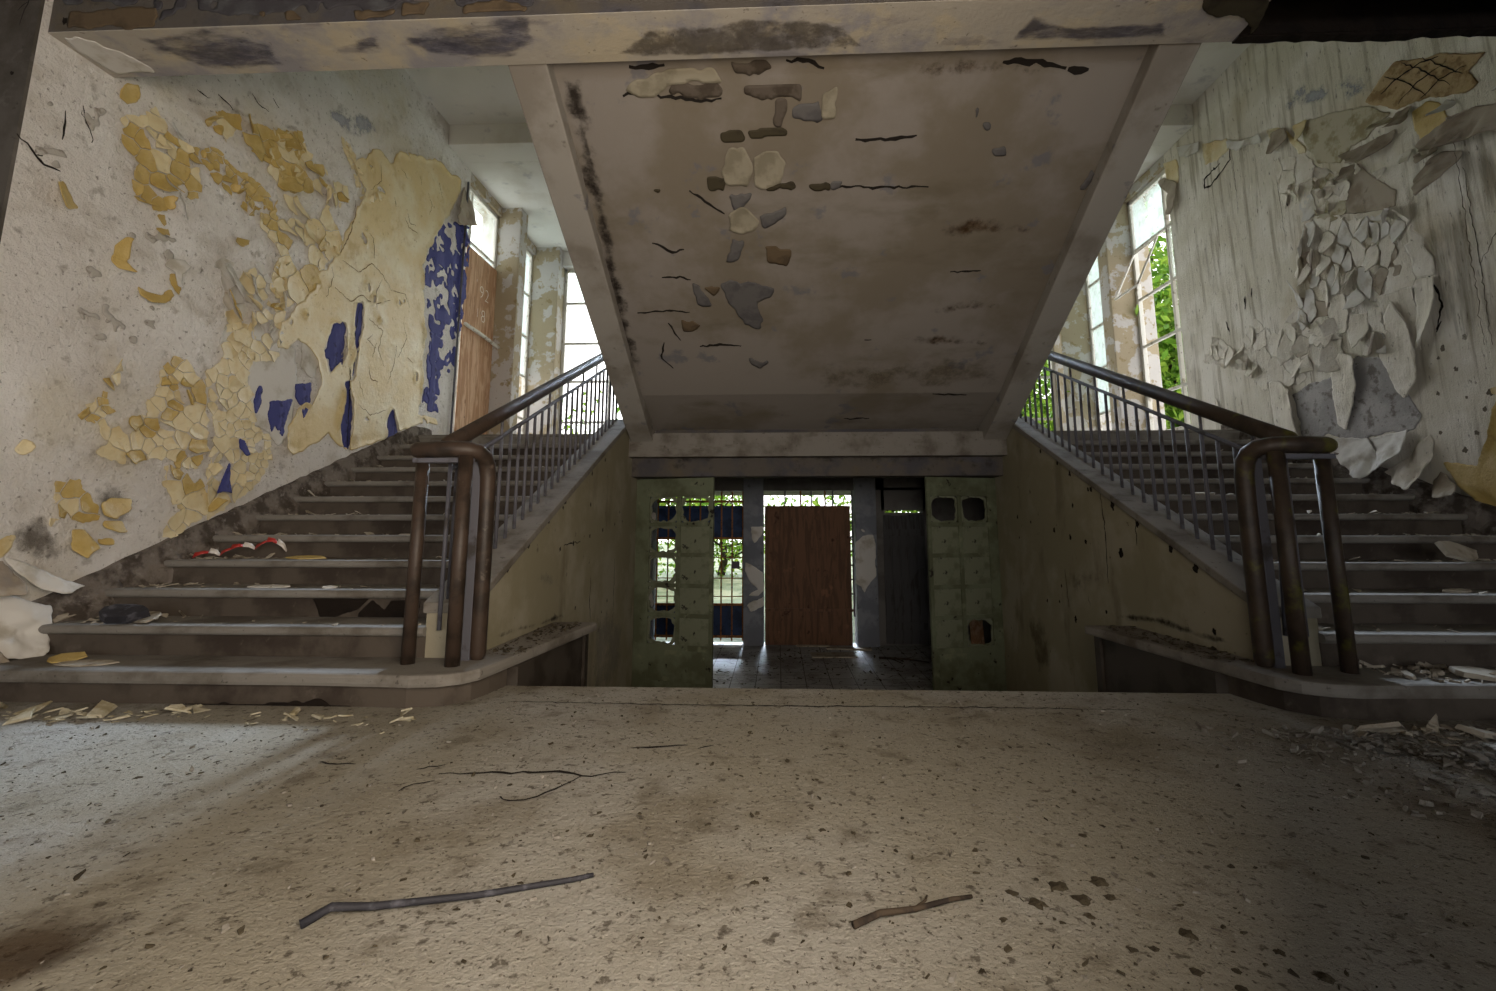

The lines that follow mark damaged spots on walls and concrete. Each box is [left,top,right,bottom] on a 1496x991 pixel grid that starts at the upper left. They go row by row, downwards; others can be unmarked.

peeling [455,0,534,14]
peeling [35,146,78,209]
peeling [626,59,842,332]
peeling [63,0,470,538]
spalling [1158,0,1496,506]
crack [1428,143,1496,345]
peeling [49,479,132,558]
crack [514,701,1132,710]
crack [399,745,713,801]